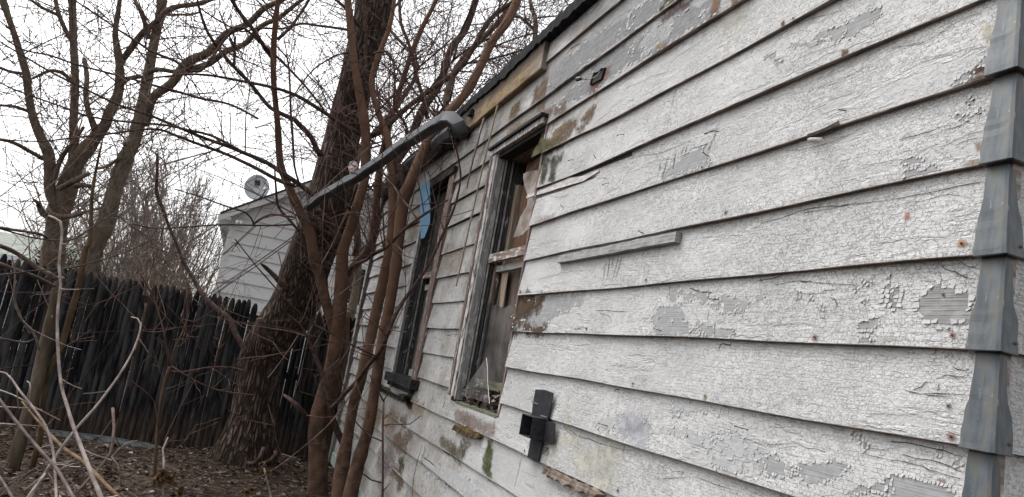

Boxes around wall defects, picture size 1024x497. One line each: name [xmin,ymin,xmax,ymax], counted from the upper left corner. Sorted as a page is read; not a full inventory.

peeling [544,0,716,111]
peeling [763,4,883,65]
water stain [507,77,596,183]
crack [761,182,980,223]
peeling [511,291,587,331]
peeling [651,288,766,341]
crack [759,275,853,318]
peeling [852,273,976,342]
crack [903,366,969,397]
water stain [454,410,495,481]
peeling [755,450,851,485]
crack [862,441,963,480]